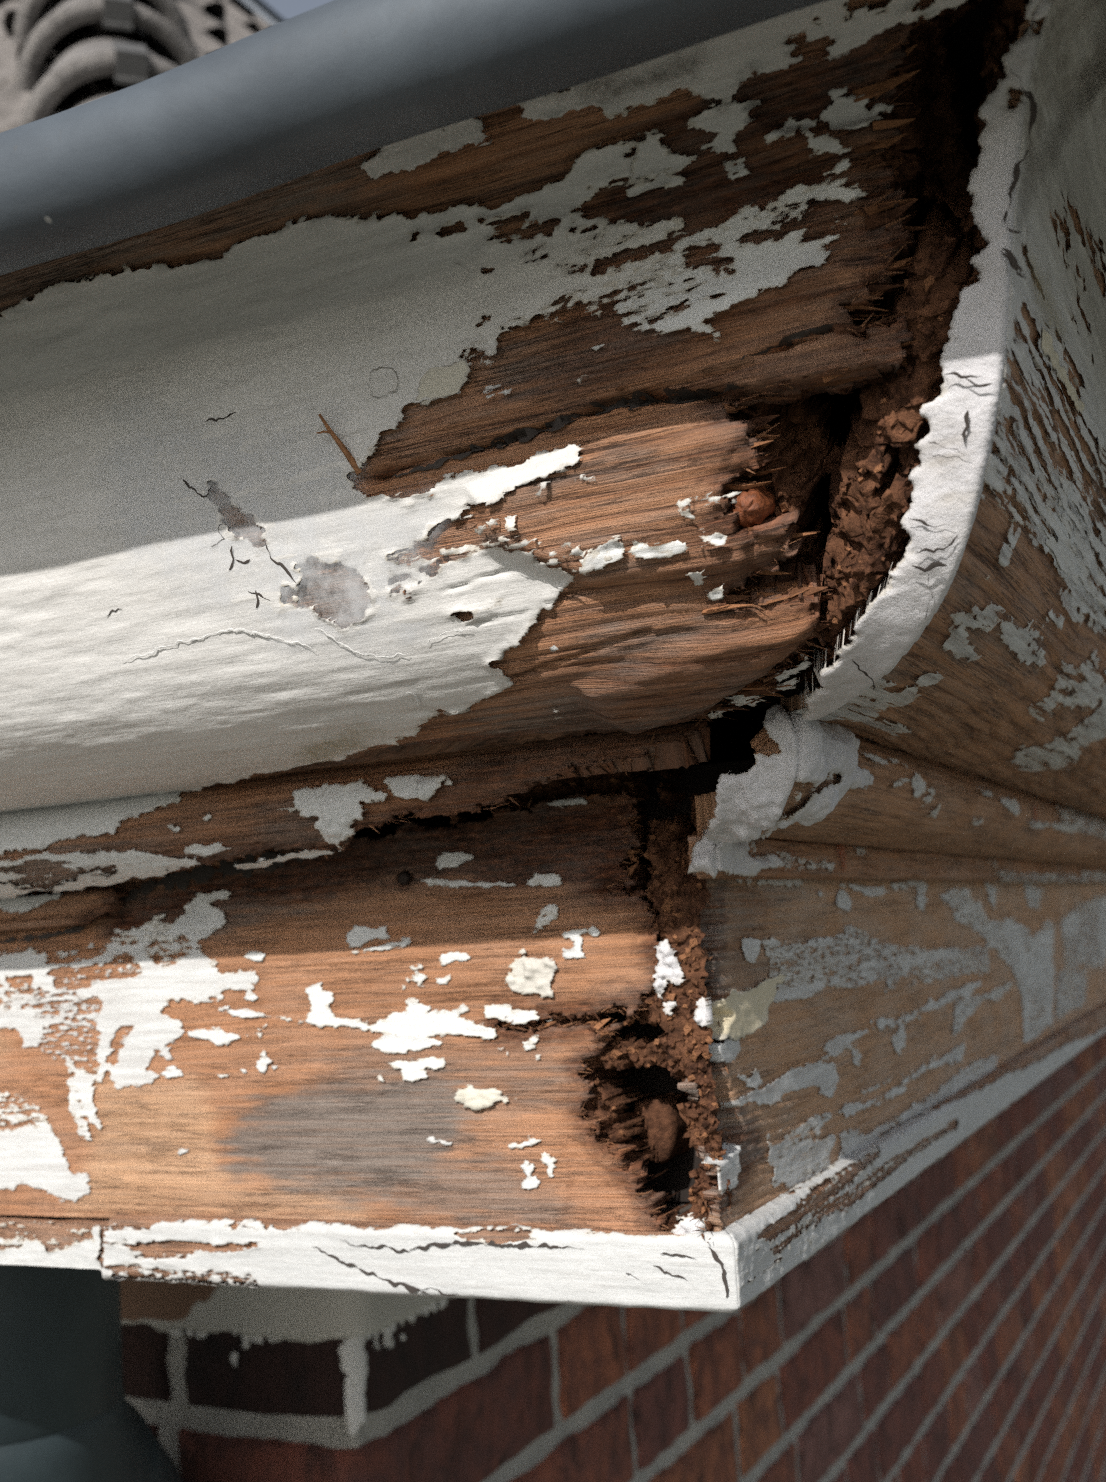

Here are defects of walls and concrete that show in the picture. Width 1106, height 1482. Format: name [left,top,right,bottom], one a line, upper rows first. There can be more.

crack [1001,69,1037,280]
peeling [0,0,966,913]
crack [929,372,993,455]
peeling [942,0,1106,772]
crack [909,518,959,618]
crack [852,659,875,690]
peeling [967,772,1106,840]
peeling [0,851,1106,1313]
crack [311,1240,574,1297]
crack [626,1247,728,1298]